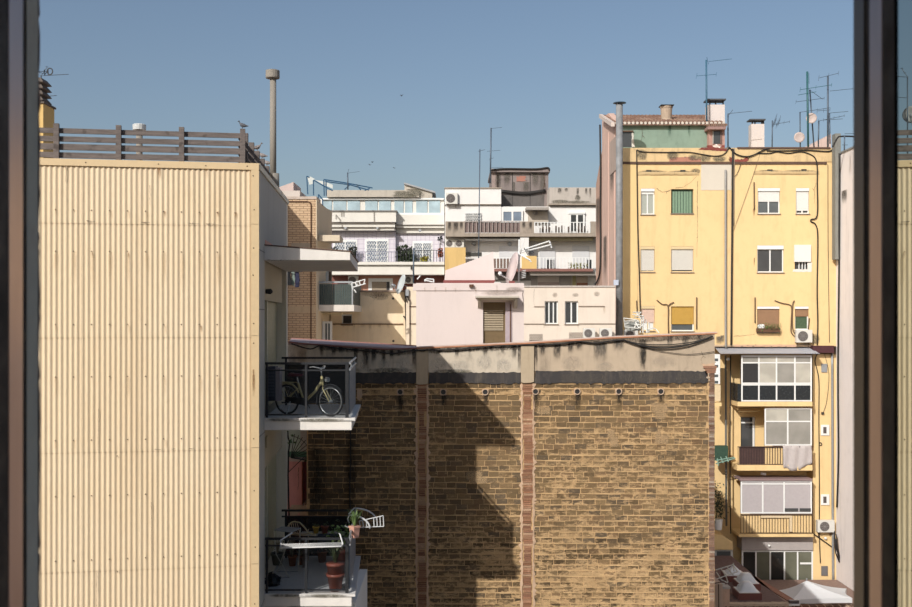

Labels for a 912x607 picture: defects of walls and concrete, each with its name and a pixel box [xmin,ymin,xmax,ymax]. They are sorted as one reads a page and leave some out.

water stain [319,346,416,373]
water stain [431,346,521,357]
water stain [534,335,724,363]